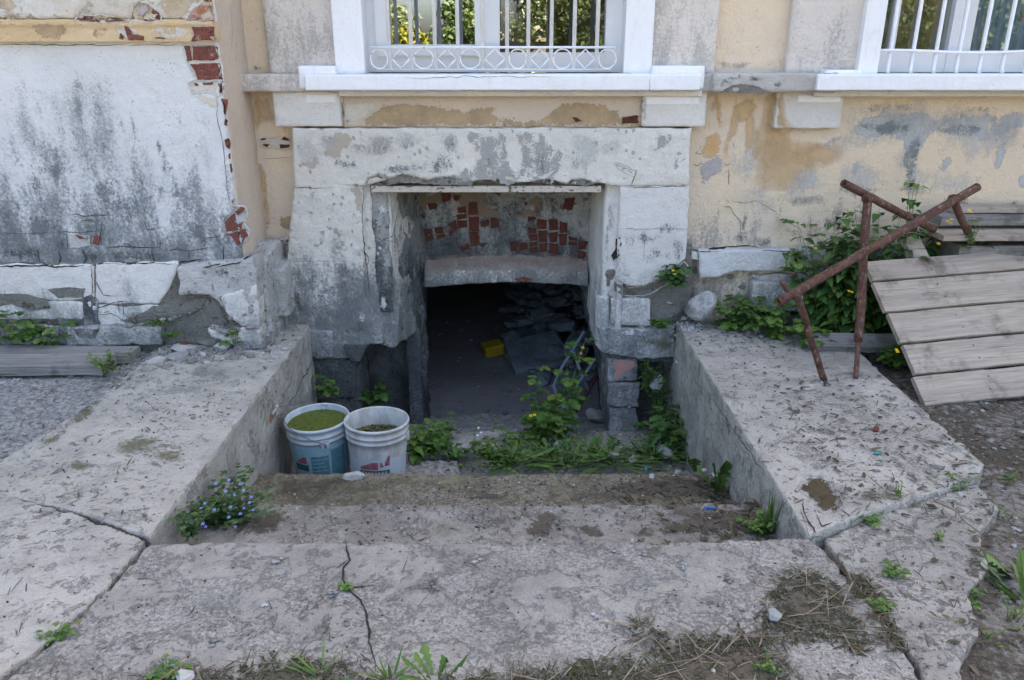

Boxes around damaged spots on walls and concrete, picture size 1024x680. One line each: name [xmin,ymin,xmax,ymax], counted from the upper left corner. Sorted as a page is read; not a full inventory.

flaking render [0,0,226,107]
damp [7,165,59,261]
damp [94,178,150,224]
flaking render [221,200,250,246]
crack [362,190,420,313]
flaking render [302,102,645,261]
peeling [695,118,724,184]
damp [859,110,926,189]
crack [38,504,147,541]
crack [337,539,376,672]